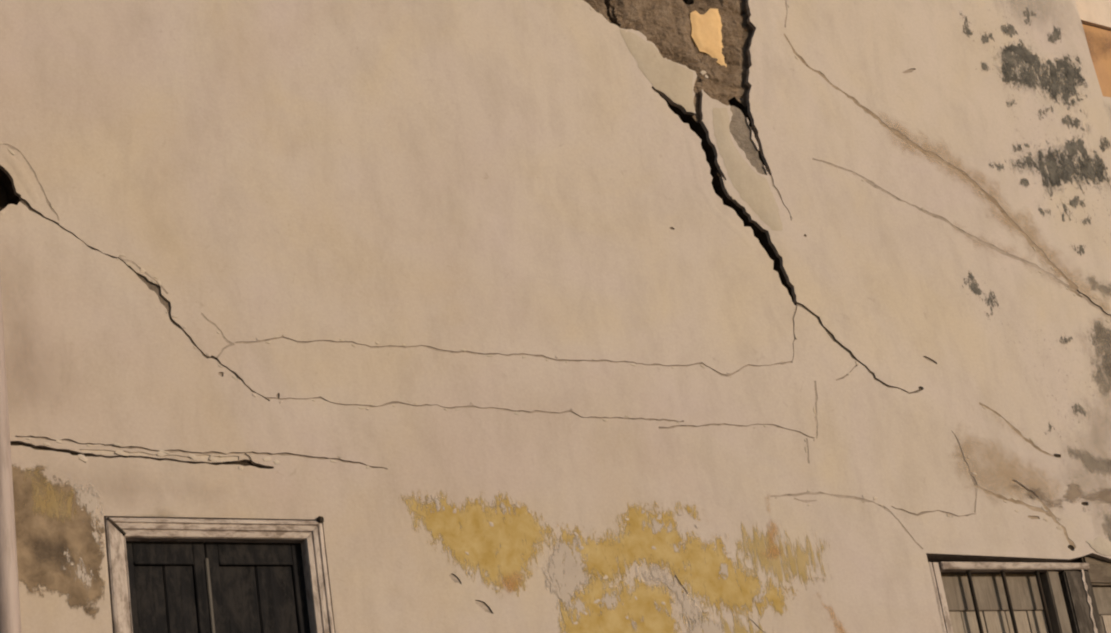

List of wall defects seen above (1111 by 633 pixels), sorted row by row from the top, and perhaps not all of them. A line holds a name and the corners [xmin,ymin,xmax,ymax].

crack [20,199,66,231]
crack [89,70,922,463]
spalling [584,0,766,175]
crack [784,0,1111,323]
water stain [960,7,1111,224]
water stain [1092,322,1111,392]
peeling [12,465,105,617]
crack [11,436,378,471]
peeling [402,492,825,633]
crack [770,433,1076,549]
water stain [1064,484,1111,503]
water stain [1068,434,1111,472]